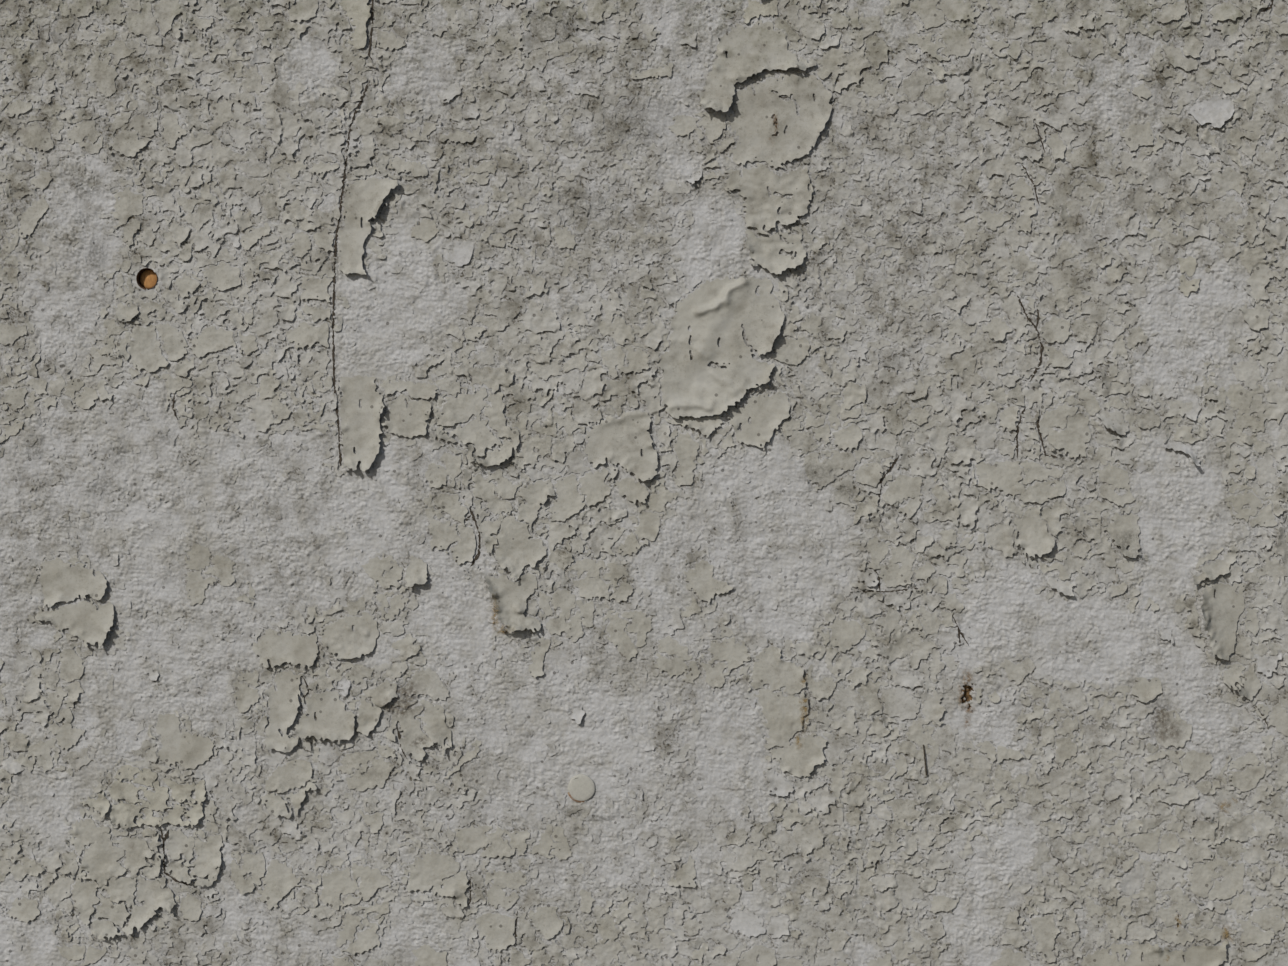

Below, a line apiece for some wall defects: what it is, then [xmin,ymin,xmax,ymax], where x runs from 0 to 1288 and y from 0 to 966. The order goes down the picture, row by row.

crack [332,0,374,466]